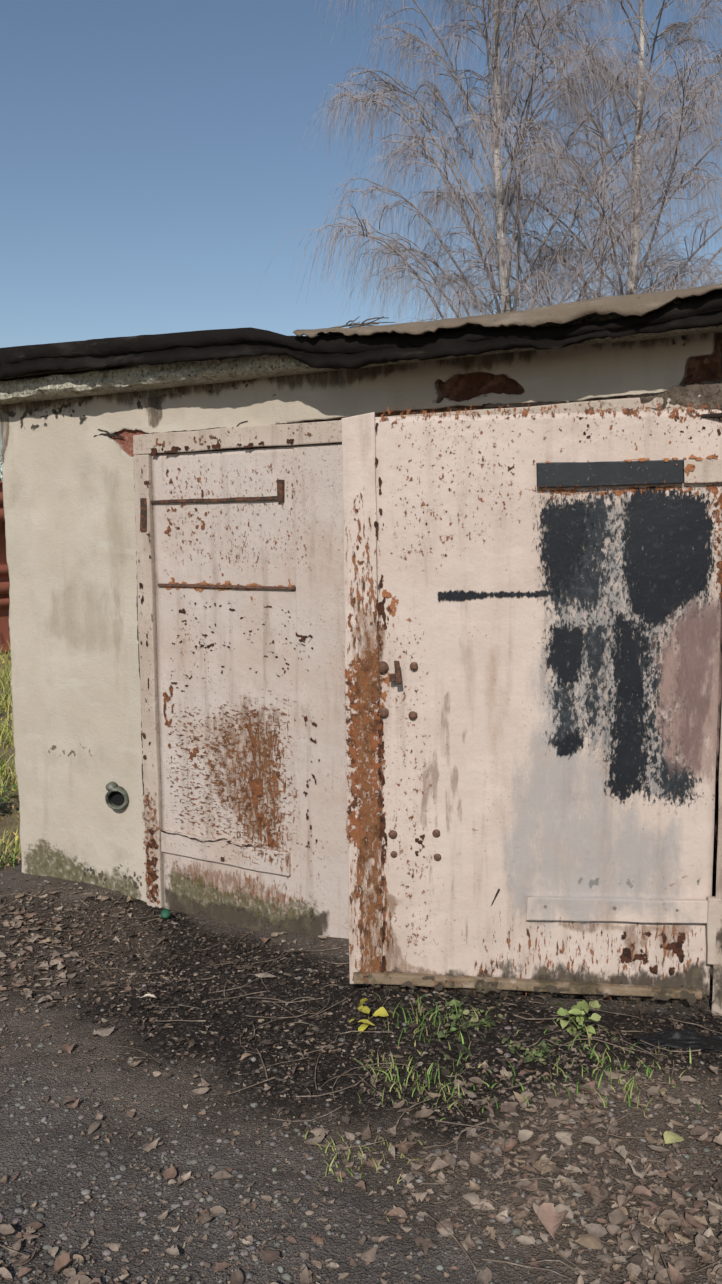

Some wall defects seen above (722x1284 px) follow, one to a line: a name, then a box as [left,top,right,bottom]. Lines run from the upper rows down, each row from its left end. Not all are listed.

spalling [684,353,722,386]
spalling [432,370,525,407]
spalling [105,427,148,457]
corrosion [138,428,320,918]
corrosion [343,400,722,973]